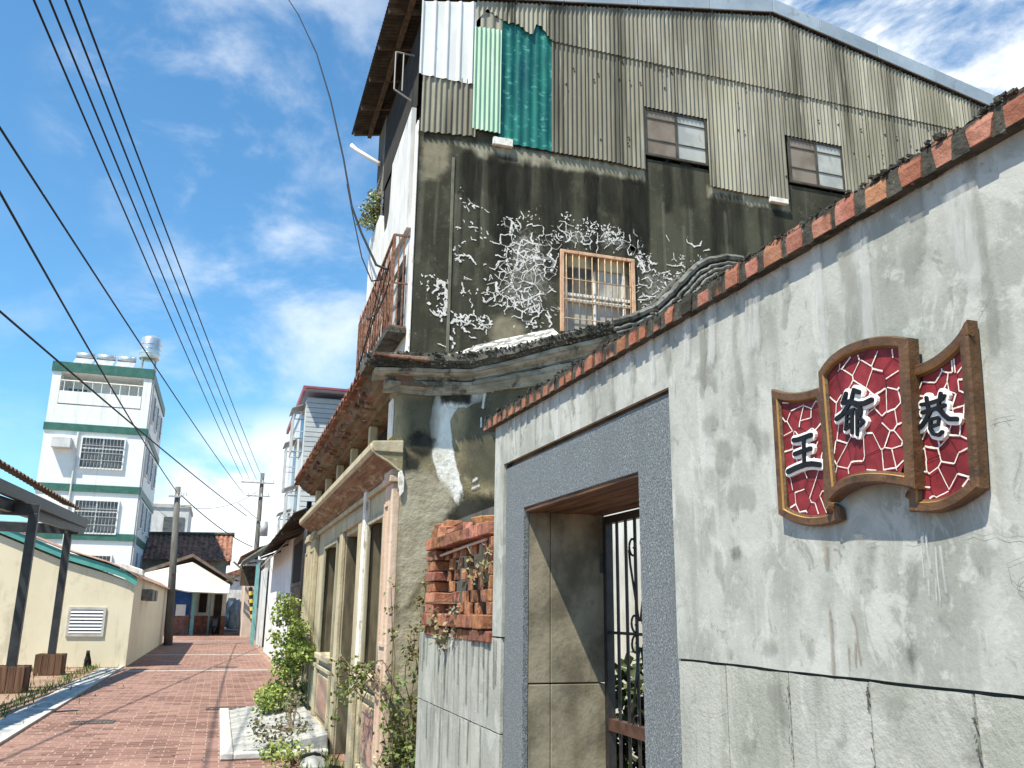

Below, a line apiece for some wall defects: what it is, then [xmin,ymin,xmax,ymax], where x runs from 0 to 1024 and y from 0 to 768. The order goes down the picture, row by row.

damp [456,141,648,280]
crack [420,187,710,349]
damp [707,186,790,256]